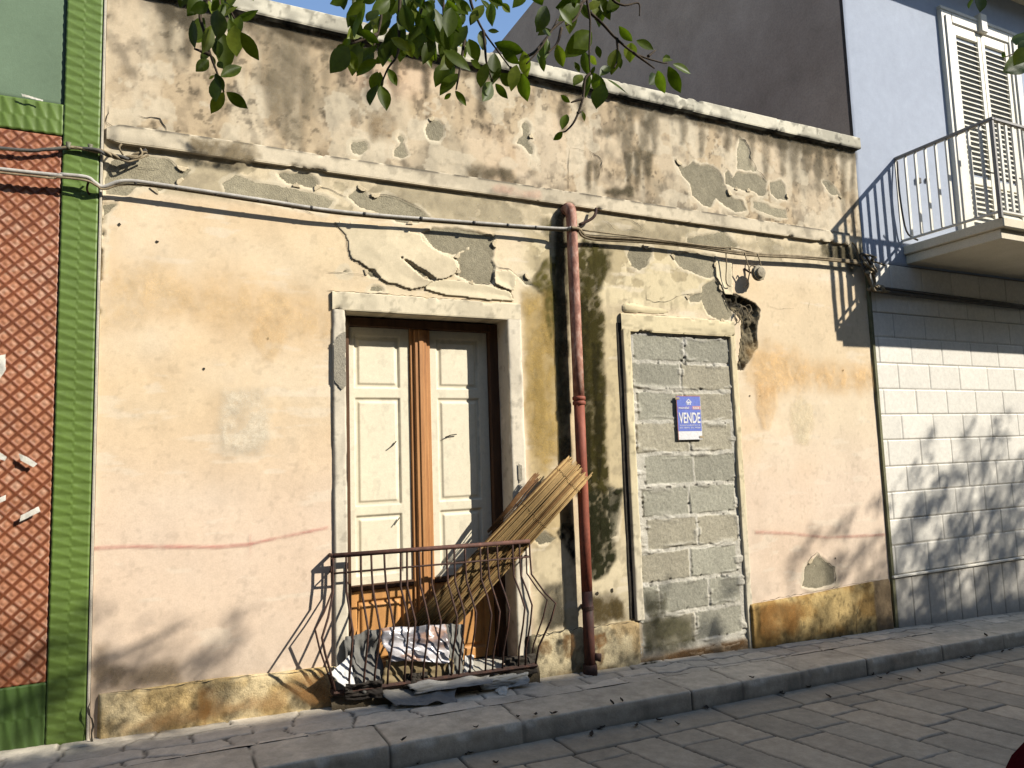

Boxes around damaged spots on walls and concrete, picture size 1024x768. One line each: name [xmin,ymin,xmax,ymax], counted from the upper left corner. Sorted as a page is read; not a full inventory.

damp [153,0,212,54]
damp [390,55,441,96]
spalling [101,156,191,236]
damp [190,137,256,161]
peeling [223,173,333,209]
spalling [348,185,496,285]
crack [330,226,514,301]
flaking render [670,231,760,370]
damp [605,98,856,215]
spalling [675,139,789,218]
damp [582,255,607,475]
spalling [802,556,834,588]